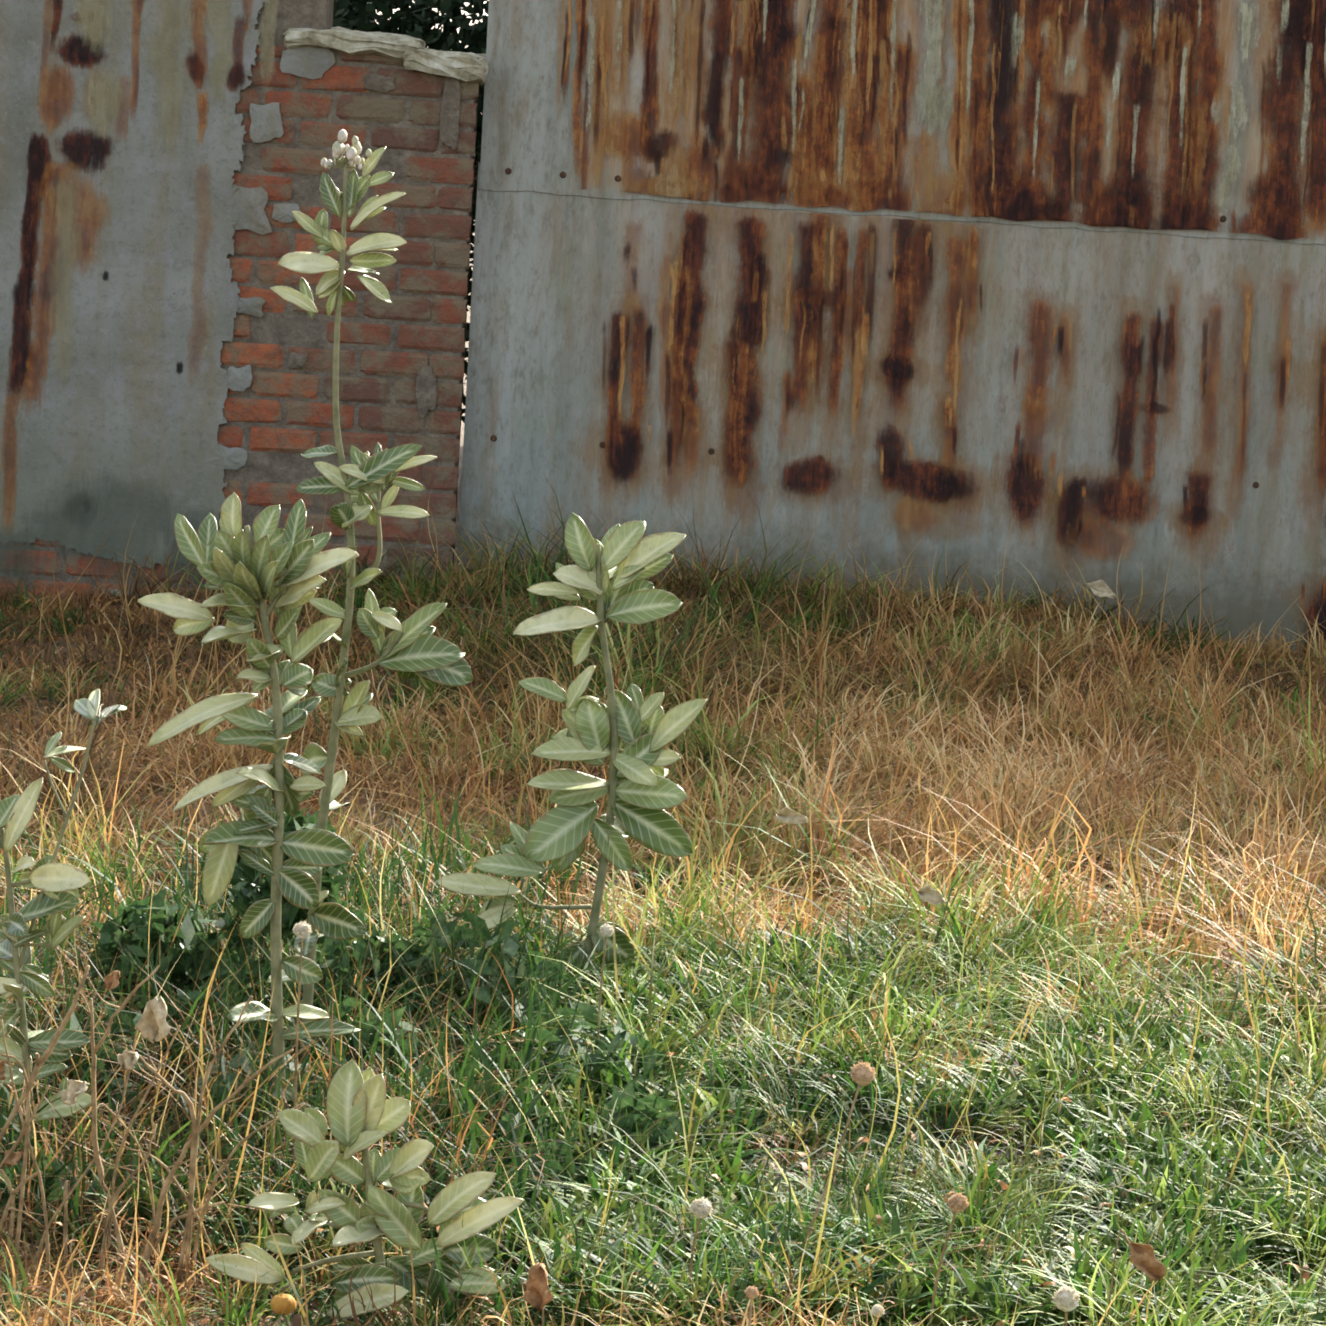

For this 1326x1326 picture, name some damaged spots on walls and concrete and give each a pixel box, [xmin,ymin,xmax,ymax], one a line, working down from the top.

corrosion [9,0,111,400]
spalling [0,538,224,599]
spalling [207,46,479,587]
corrosion [561,0,1326,504]
corrosion [1008,300,1175,558]
corrosion [1180,471,1212,539]
corrosion [1301,579,1326,643]